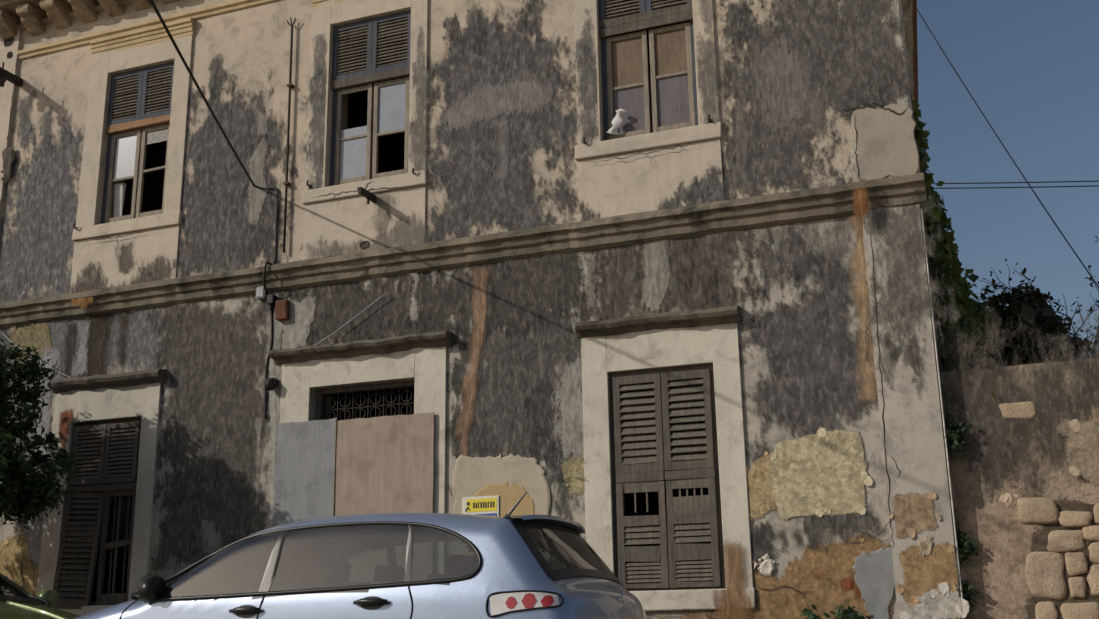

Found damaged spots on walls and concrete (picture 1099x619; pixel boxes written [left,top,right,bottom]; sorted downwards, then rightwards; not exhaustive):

mould [0,34,327,303]
mould [300,0,600,258]
crack [598,142,698,166]
mould [658,0,914,210]
peeling [0,530,42,596]
rust [455,267,490,456]
water stain [0,195,1099,579]
peeling [746,428,873,521]
rust [849,188,877,400]
crack [865,221,901,546]
spalling [888,475,1099,619]
peeling [1056,407,1099,485]